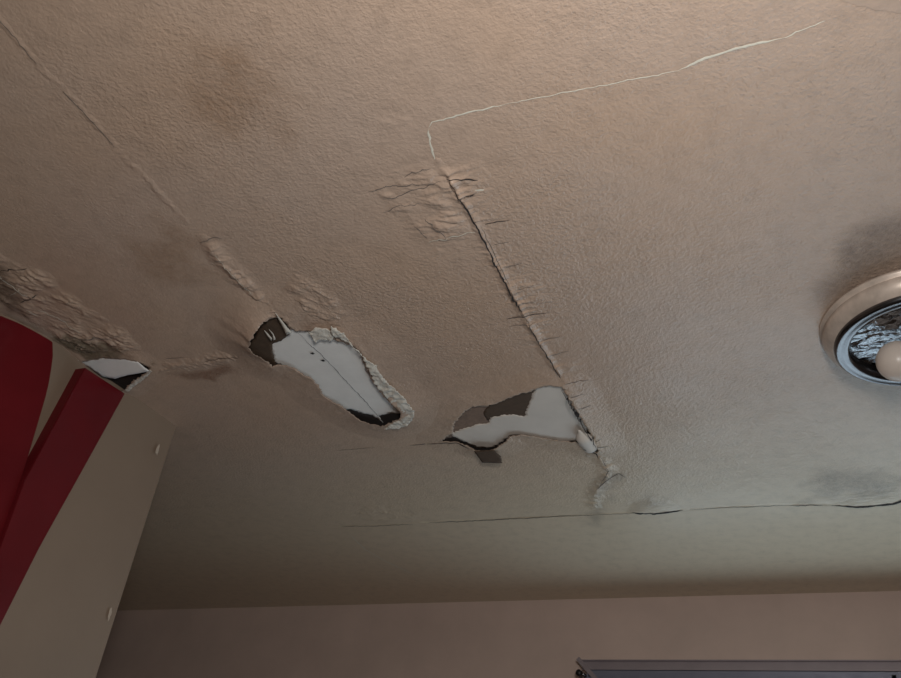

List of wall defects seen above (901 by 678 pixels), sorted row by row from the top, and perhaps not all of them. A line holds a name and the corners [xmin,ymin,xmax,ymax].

crack [427,21,824,377]
peeling [66,349,169,397]
peeling [203,285,628,463]
crack [332,450,901,528]